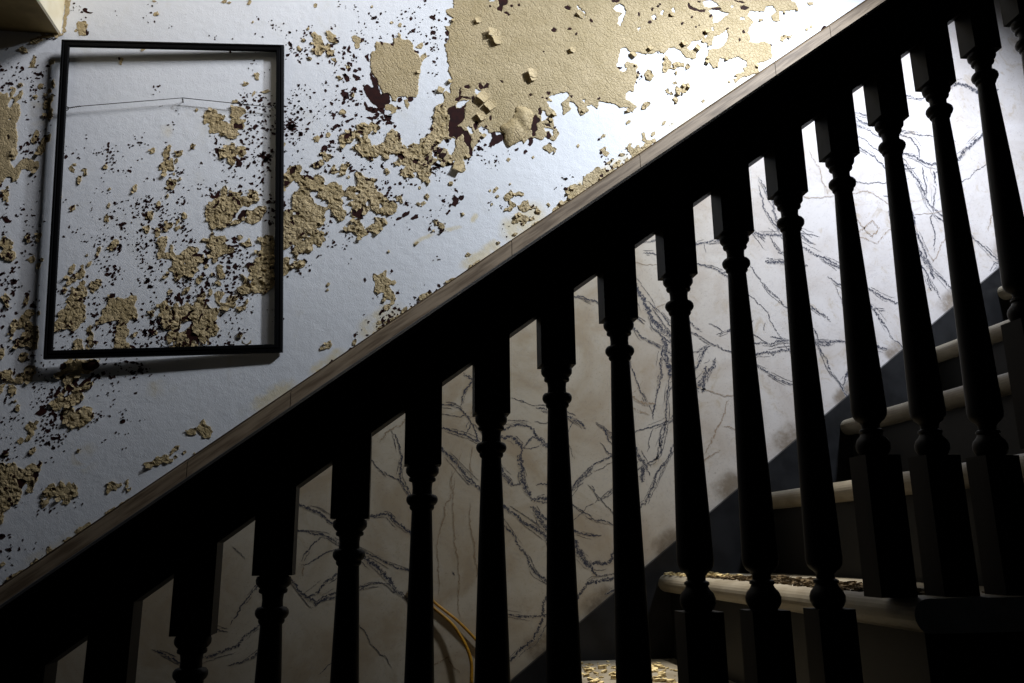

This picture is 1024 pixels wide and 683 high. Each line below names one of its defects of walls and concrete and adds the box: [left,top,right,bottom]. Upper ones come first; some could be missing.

peeling [0,0,813,586]